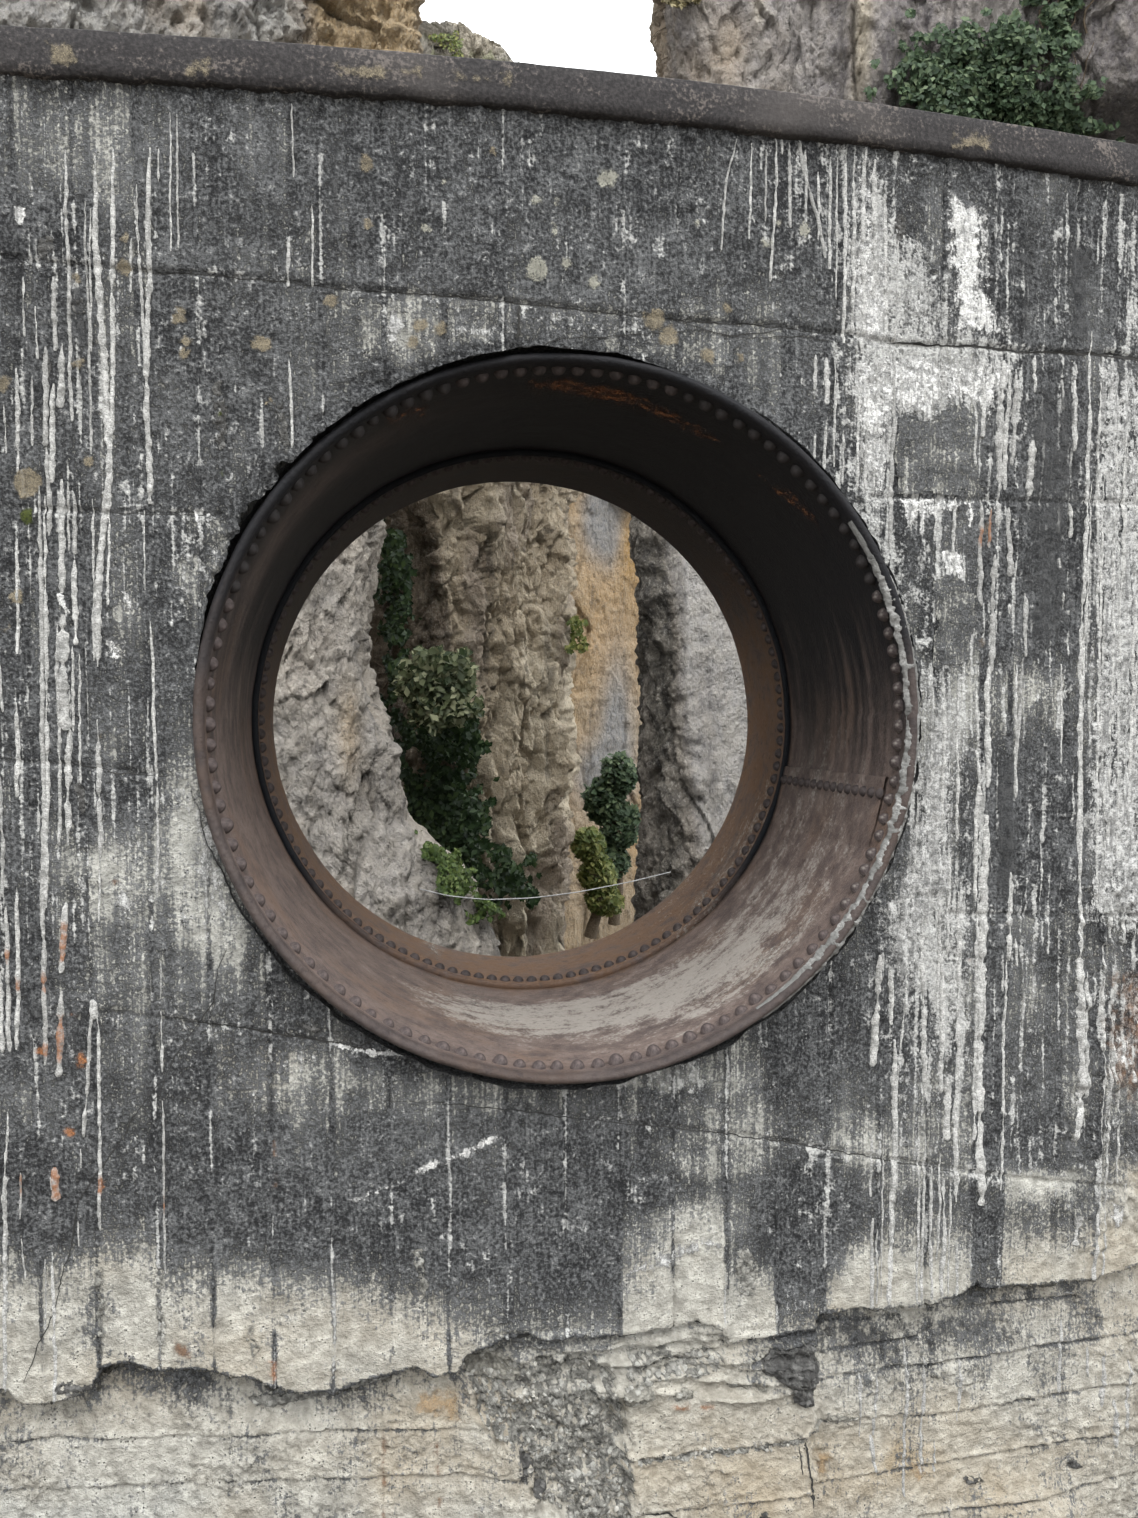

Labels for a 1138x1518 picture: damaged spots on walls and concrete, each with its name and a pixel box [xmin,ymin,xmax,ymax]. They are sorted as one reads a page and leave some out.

leakage [0,112,180,1077]
leakage [720,138,1138,1310]
leakage [80,999,103,1231]
leakage [333,1043,402,1058]
leakage [1,1112,26,1392]
spalling [34,1268,399,1407]
spalling [412,1248,429,1292]
spalling [974,1279,1096,1291]
crack [642,1510,677,1518]
spalling [461,1314,859,1518]
crack [799,1443,815,1509]
spalling [1066,1459,1082,1469]